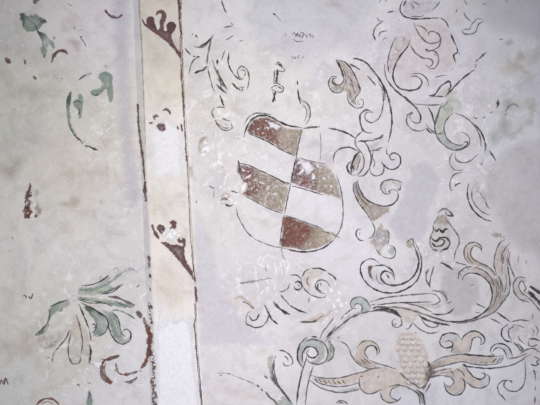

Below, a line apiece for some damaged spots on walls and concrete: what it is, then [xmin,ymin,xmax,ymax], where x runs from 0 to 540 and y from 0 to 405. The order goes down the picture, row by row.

peeling [147,274,199,405]